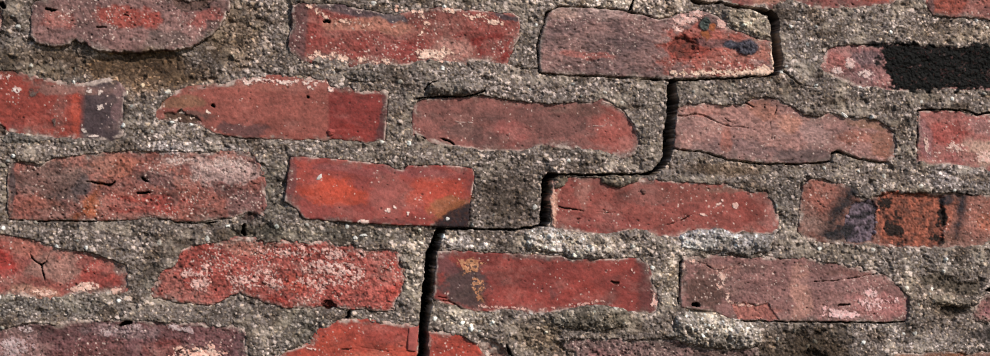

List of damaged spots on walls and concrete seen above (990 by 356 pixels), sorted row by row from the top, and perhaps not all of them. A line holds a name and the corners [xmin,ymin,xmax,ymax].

crack [417,81,484,99]
crack [504,76,711,230]
crack [417,228,441,356]